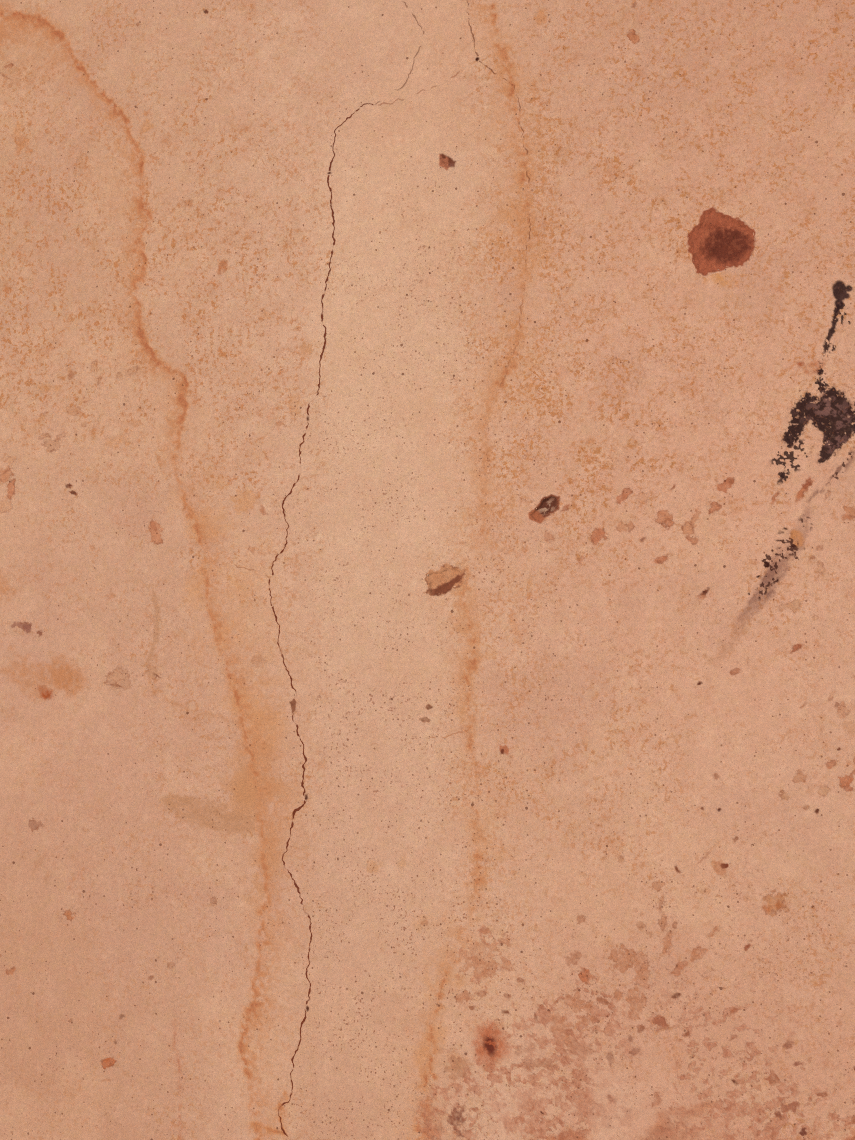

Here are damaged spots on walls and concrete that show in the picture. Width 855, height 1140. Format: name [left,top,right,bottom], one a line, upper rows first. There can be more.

flaking render [434,150,460,175]
water stain [768,279,855,504]
water stain [0,0,327,1140]
crack [231,0,531,1140]
flaking render [418,557,473,601]
water stain [369,0,578,1140]
spalling [523,489,573,543]
peeling [577,475,735,566]